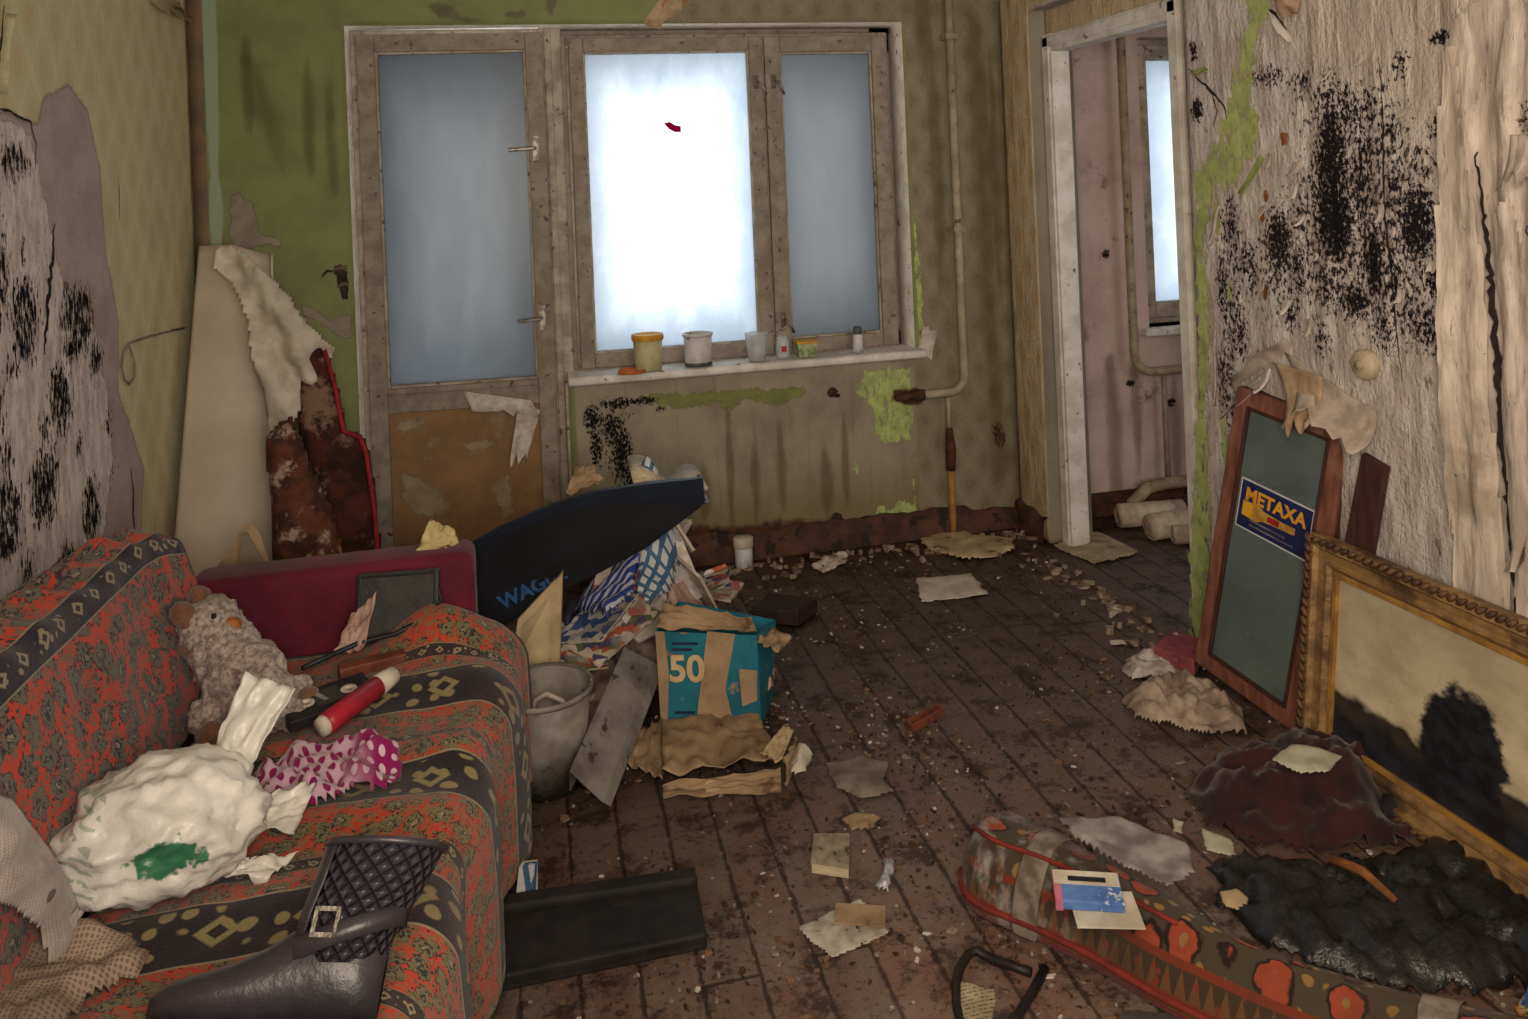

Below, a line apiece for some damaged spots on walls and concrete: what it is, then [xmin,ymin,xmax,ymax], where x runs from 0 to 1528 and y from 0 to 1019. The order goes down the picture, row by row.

water stain [1429,29,1450,46]
water stain [1190,97,1203,124]
water stain [1,134,31,186]
flaking render [0,118,113,598]
water stain [0,209,119,585]
water stain [583,396,665,487]
peeling [639,386,805,410]
peeling [827,365,916,445]
peeling [913,222,937,361]
water stain [1215,50,1440,461]
peeling [1392,289,1405,305]
peeling [1422,46,1528,618]